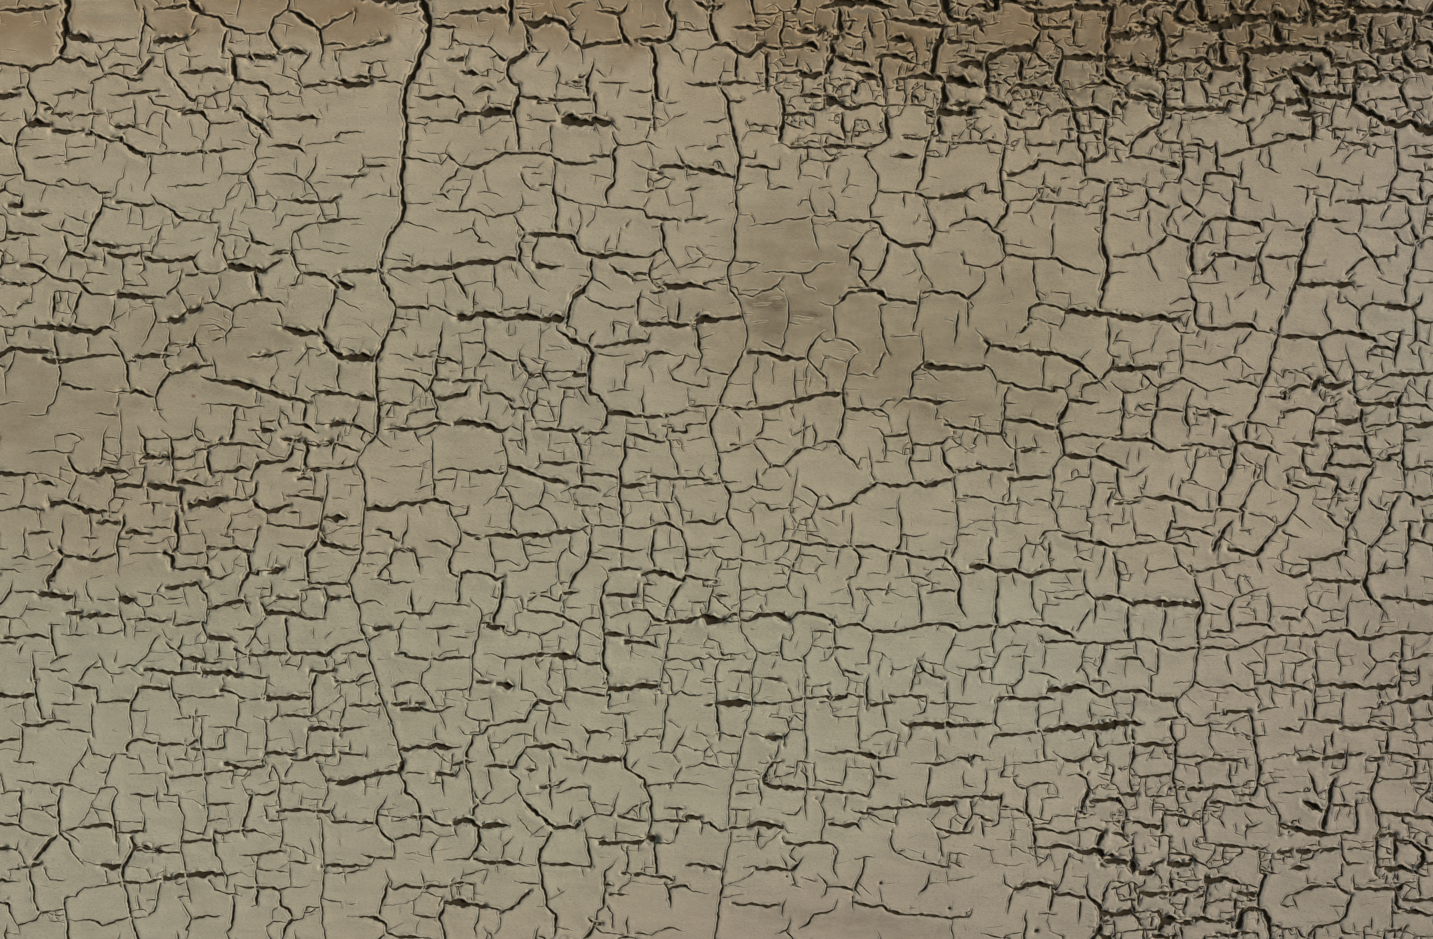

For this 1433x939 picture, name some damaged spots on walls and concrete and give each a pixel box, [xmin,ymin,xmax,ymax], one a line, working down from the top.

crack [267,129,363,155]
crack [362,515,435,587]
crack [14,553,127,639]
crack [1208,574,1276,635]
crack [0,580,96,778]
crack [21,789,85,866]
crack [781,798,840,880]
crack [1054,772,1095,828]
crack [1082,794,1130,840]
crack [1193,838,1269,860]
crack [581,857,685,939]
crack [850,886,974,939]